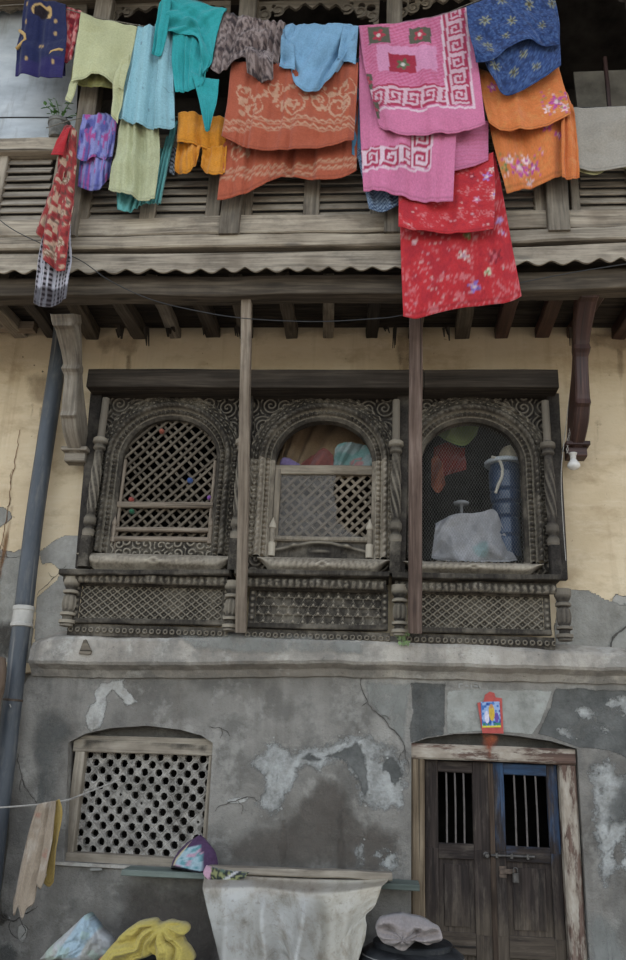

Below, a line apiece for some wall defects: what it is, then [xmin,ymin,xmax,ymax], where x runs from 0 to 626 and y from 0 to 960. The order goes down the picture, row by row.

peeling [0,506,15,527]
crack [0,430,20,560]
peeling [0,548,21,627]
peeling [26,535,78,663]
peeling [554,590,626,647]
peeling [85,679,137,731]
crack [360,680,410,776]
peeling [575,706,595,720]
peeling [605,695,626,717]
peeling [226,731,409,817]
peeling [587,757,626,888]